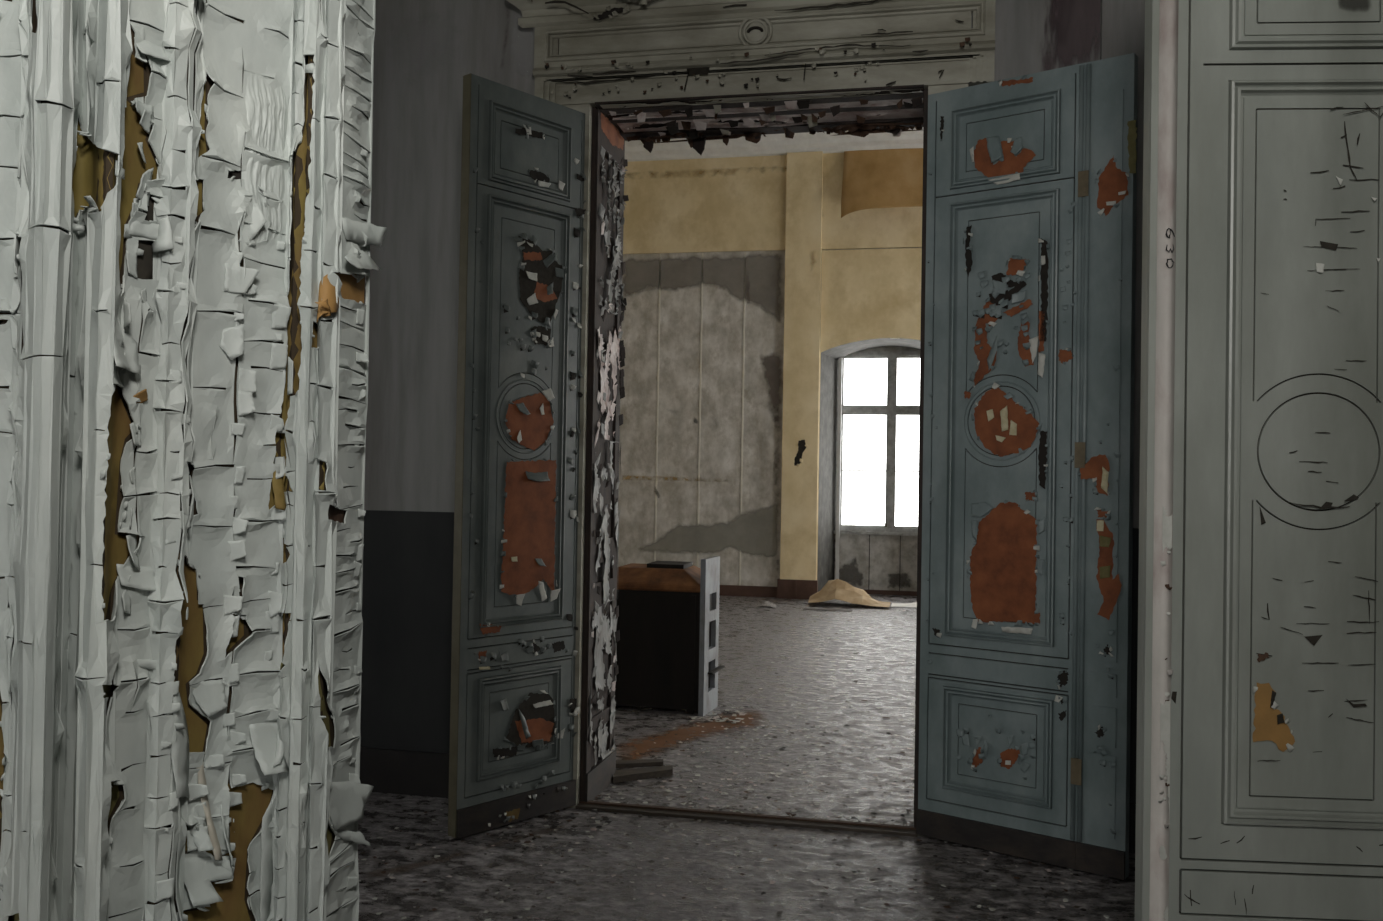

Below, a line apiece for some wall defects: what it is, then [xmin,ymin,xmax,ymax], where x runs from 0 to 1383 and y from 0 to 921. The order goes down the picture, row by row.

peeling [195,179,205,226]
peeling [198,83,208,157]
peeling [970,136,1036,185]
peeling [72,26,183,620]
peeling [220,58,387,672]
peeling [478,42,923,765]
peeling [963,225,1074,634]
peeling [1077,454,1122,620]
peeling [0,704,8,831]
peeling [137,462,289,921]
peeling [326,758,374,855]
peeling [1252,683,1295,752]